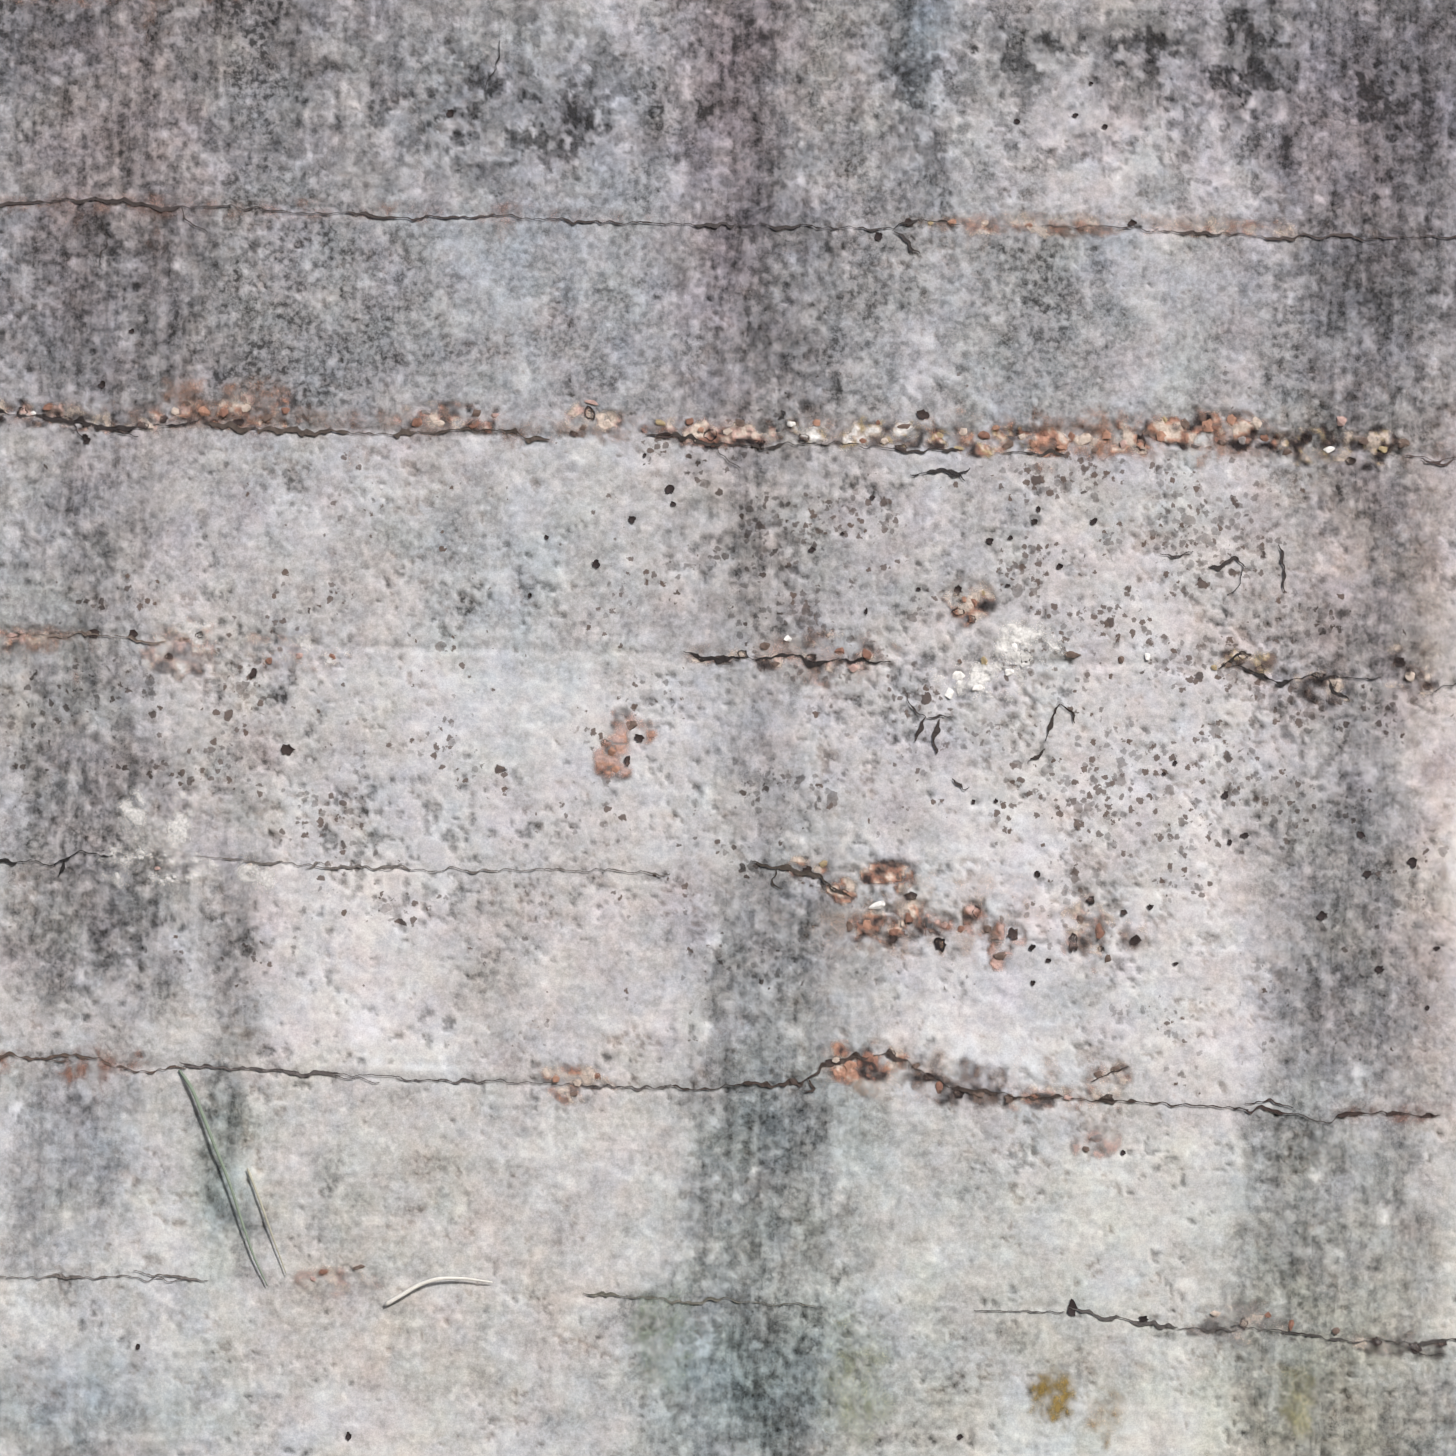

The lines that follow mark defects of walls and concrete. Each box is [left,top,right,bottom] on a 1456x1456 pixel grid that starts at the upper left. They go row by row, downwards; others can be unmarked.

crack [0,197,960,265]
crack [1041,225,1456,241]
damp [650,0,846,640]
spalling [0,394,290,444]
spalling [641,408,1410,470]
damp [0,0,659,1006]
damp [1307,446,1422,870]
spalling [791,856,1143,970]
crack [0,1051,1440,1123]
spalling [825,1042,1130,1109]
damp [671,824,850,1456]
crack [974,1307,1456,1356]